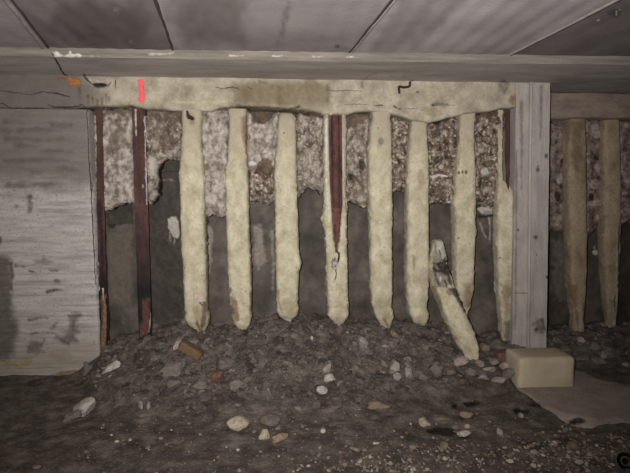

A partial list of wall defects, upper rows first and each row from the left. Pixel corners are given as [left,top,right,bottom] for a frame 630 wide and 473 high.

crack [1,90,96,285]
spalling [102,108,194,211]
spalling [202,110,229,217]
spalling [247,110,282,205]
spalling [292,106,333,214]
corrosion [332,208,341,259]
spalling [344,113,371,208]
spalling [390,117,409,192]
spalling [427,117,467,204]
spalling [474,110,504,218]
spalling [545,121,564,232]
spalling [585,120,602,236]